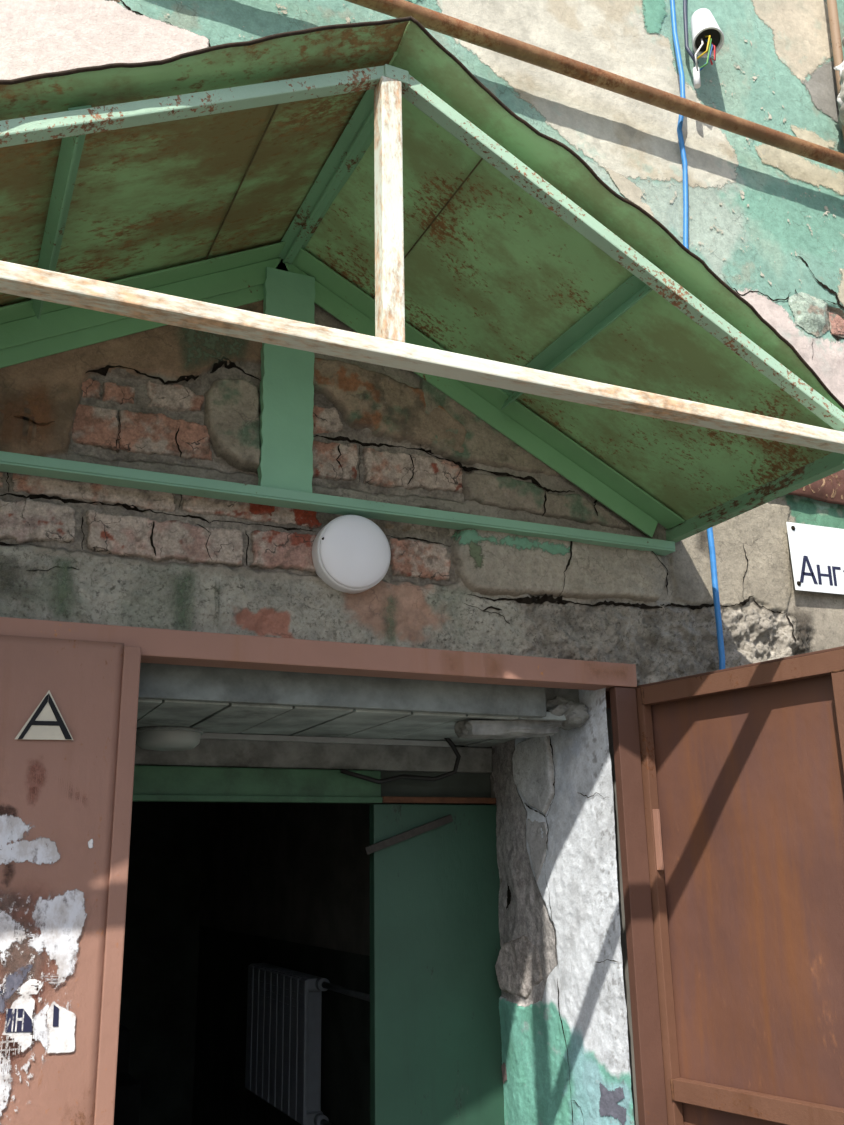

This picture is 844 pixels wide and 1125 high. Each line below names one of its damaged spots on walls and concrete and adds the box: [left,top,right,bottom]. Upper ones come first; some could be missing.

peeling [0,0,209,80]
peeling [437,0,735,109]
peeling [751,0,839,122]
peeling [454,38,844,260]
crack [723,256,844,358]
peeling [735,266,844,405]
crack [0,542,79,571]
crack [464,603,509,624]
crack [660,545,796,641]
spalling [487,736,558,1007]
crack [525,736,606,1123]
peeling [599,1083,626,1125]